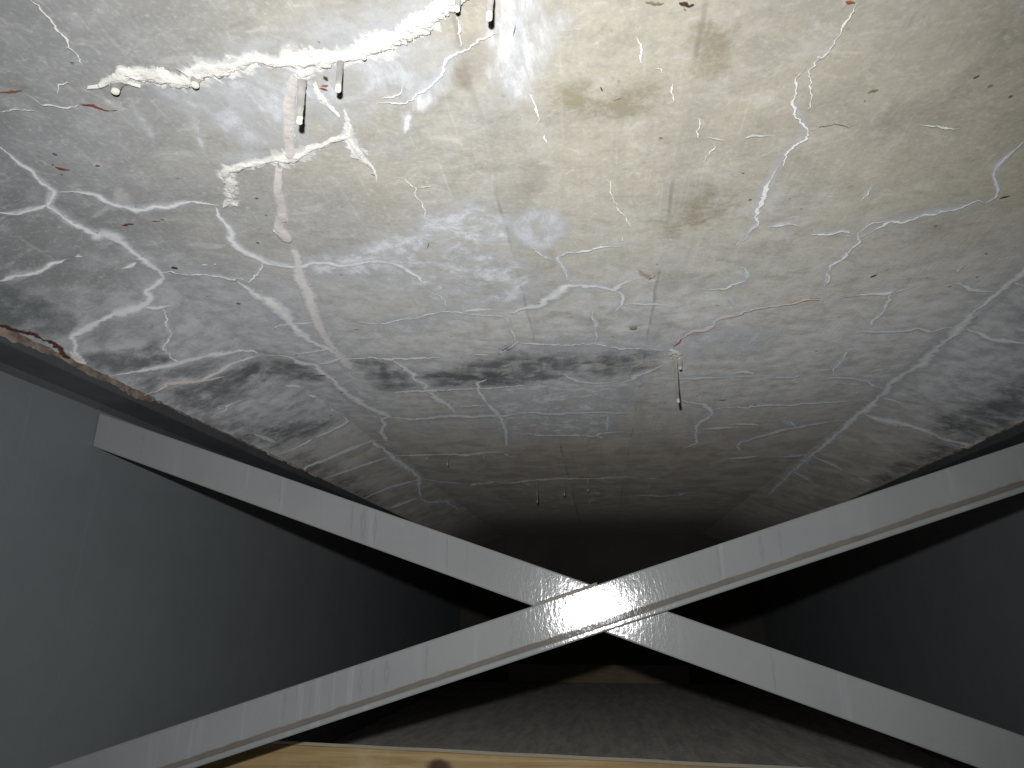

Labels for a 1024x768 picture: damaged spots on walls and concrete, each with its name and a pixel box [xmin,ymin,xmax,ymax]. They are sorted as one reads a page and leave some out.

corrosion [0,324,85,368]
damp [87,0,565,377]
crack [0,0,1024,510]
damp [434,329,774,438]